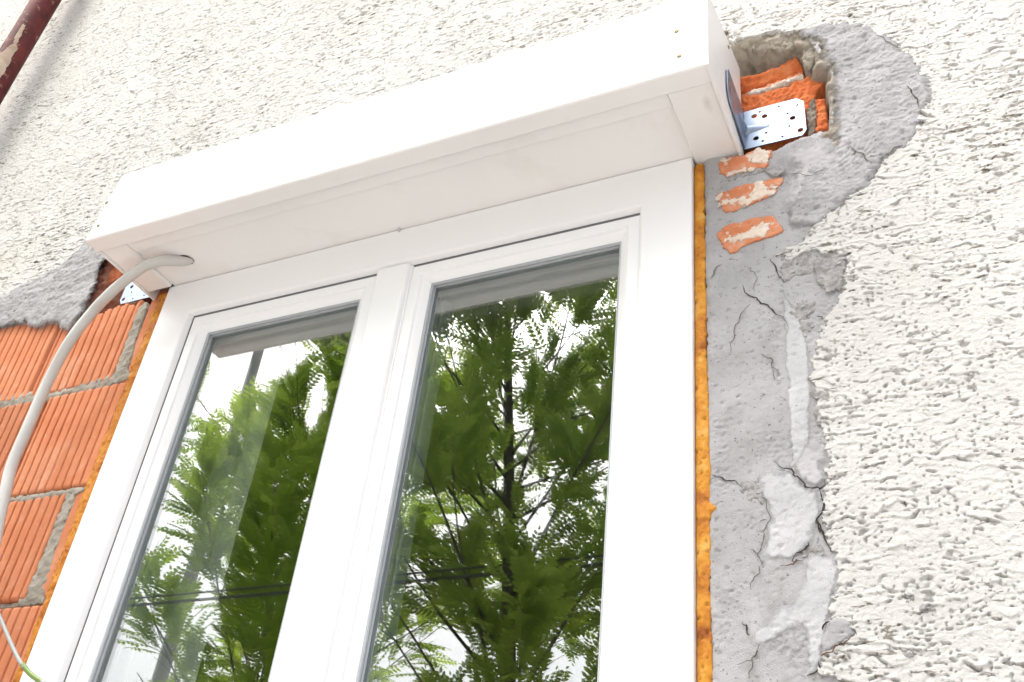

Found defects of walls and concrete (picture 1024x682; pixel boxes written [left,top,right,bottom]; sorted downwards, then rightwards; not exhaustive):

spalling [715,10,841,254]
spalling [780,254,848,292]
crack [730,260,789,346]
spalling [789,299,818,337]
spalling [809,390,830,426]
flaking render [0,259,174,682]
spalling [740,480,767,505]
peeling [795,445,827,484]
crack [750,461,832,588]
spalling [904,592,936,613]
crack [737,623,759,673]
crack [807,621,857,676]